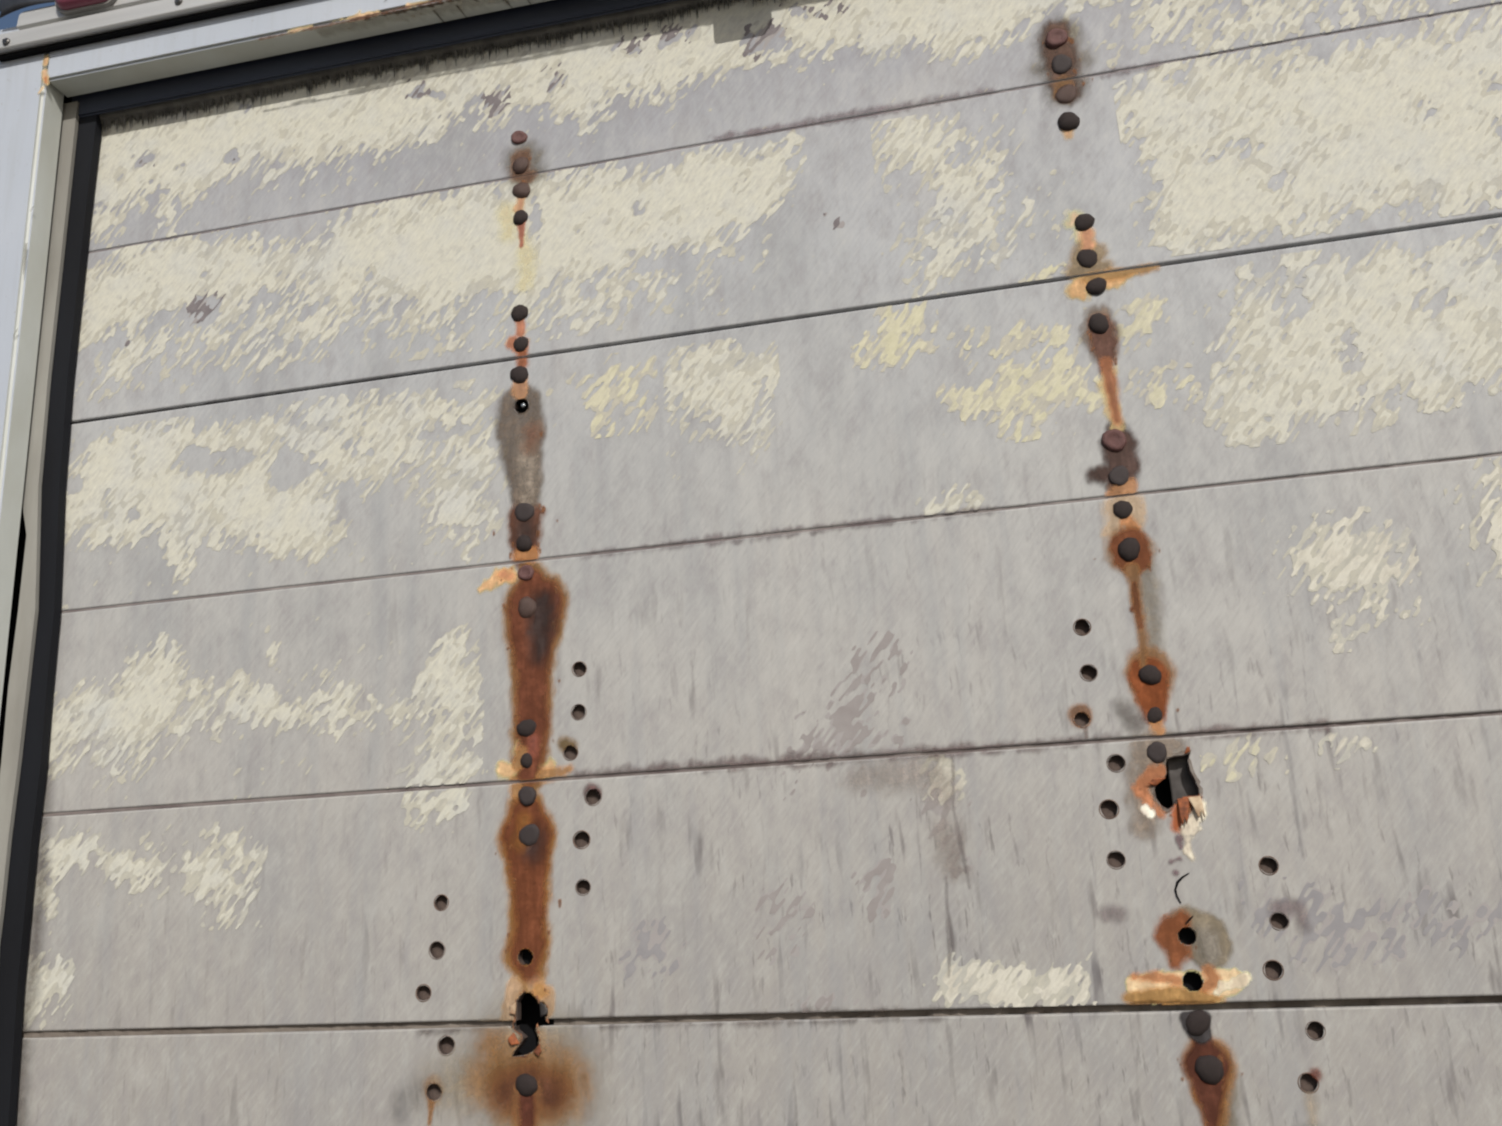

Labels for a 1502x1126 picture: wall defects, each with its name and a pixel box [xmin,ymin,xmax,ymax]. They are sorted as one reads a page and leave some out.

rust [1036,22,1093,100]
peeling [73,0,1502,448]
peeling [64,378,508,595]
leakage [497,379,545,504]
rust [1066,211,1207,874]
peeling [23,758,313,1030]
peeling [46,622,488,833]
rust [425,503,579,1126]
peeling [923,952,1097,1008]
peeling [1124,966,1252,1004]
rust [1155,906,1232,969]
rust [1180,1011,1235,1126]